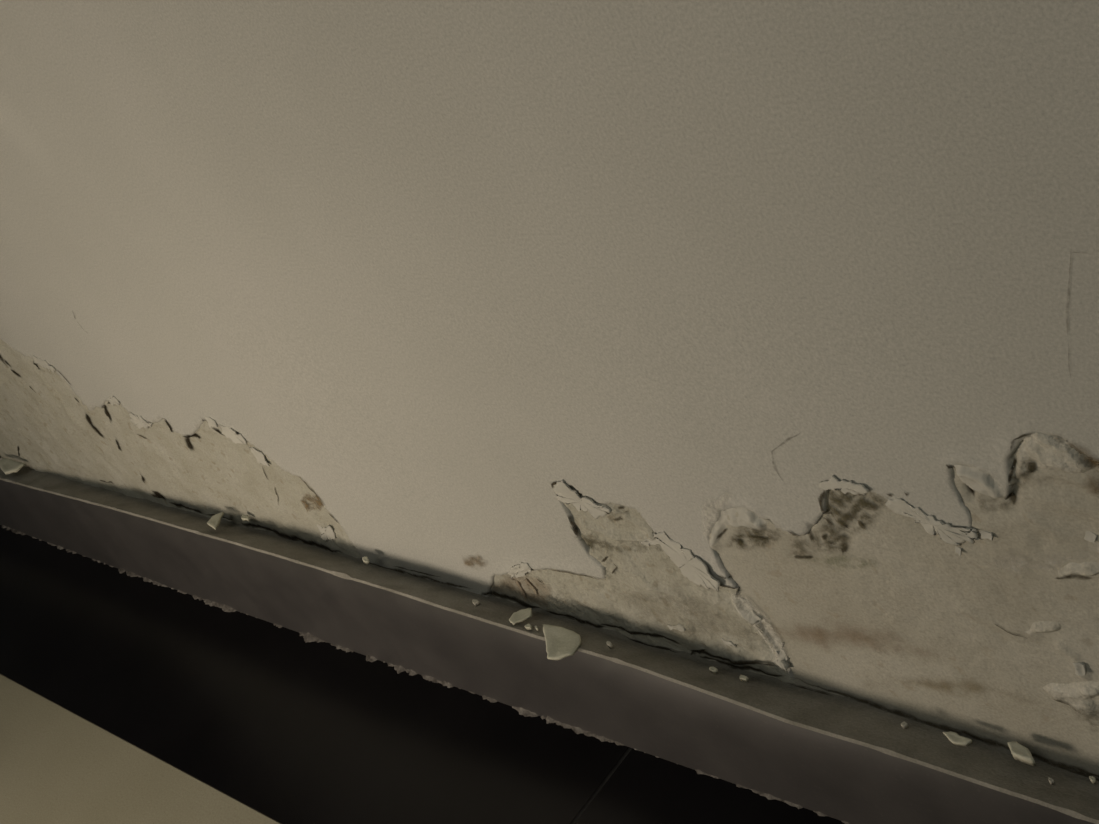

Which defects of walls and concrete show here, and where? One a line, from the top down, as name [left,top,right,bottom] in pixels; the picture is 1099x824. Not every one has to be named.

peeling [0,339,362,558]
peeling [491,434,1099,778]